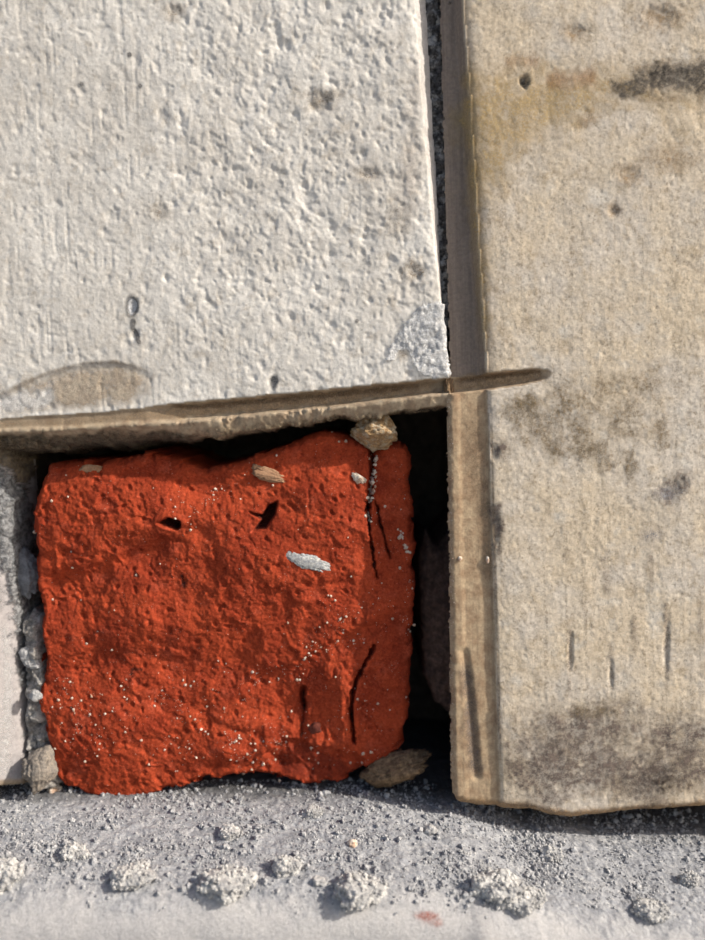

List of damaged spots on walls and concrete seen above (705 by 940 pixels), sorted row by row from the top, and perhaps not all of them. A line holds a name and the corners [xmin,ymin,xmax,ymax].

water stain [459,60,705,180]
water stain [505,387,606,465]
peeling [79,464,102,473]
peeling [351,473,367,484]
water stain [660,473,688,502]
spalling [161,518,181,529]
spalling [255,503,277,529]
crack [367,457,389,575]
peeling [286,551,331,572]
crack [350,652,372,736]